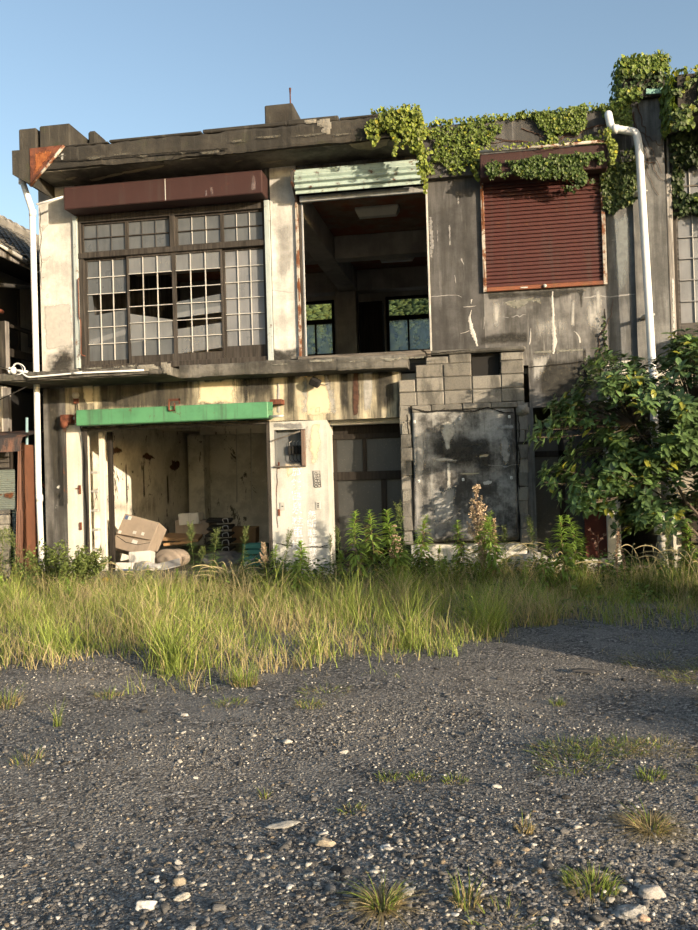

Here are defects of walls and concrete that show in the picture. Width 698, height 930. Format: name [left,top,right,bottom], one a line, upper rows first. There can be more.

rust [35,150,51,173]
leakage [528,214,634,399]
leakage [277,374,349,413]
leakage [363,372,372,410]
leakage [497,425,513,468]
leakage [415,422,456,524]